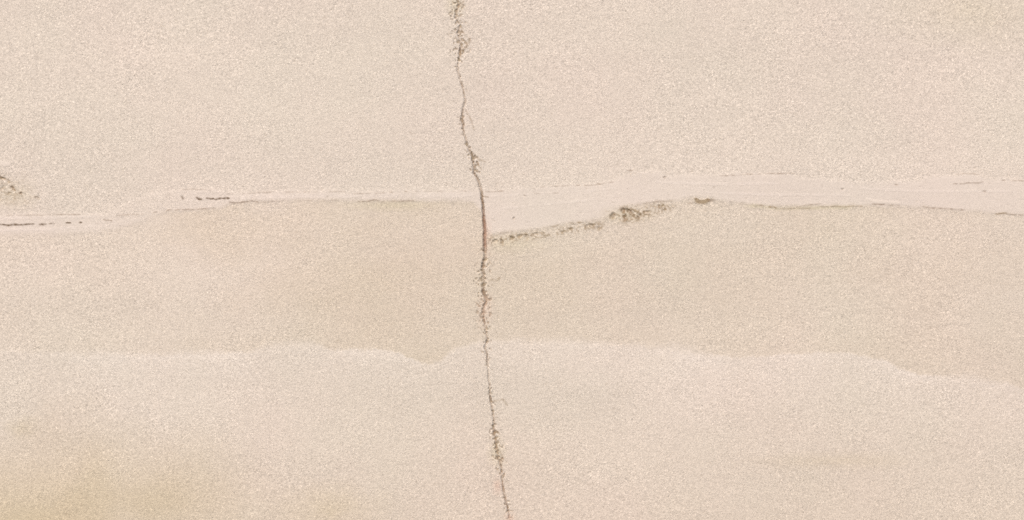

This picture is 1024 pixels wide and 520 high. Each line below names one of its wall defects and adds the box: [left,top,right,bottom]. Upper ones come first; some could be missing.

spalling [0,167,41,210]
spalling [692,197,717,205]
spalling [486,200,678,248]